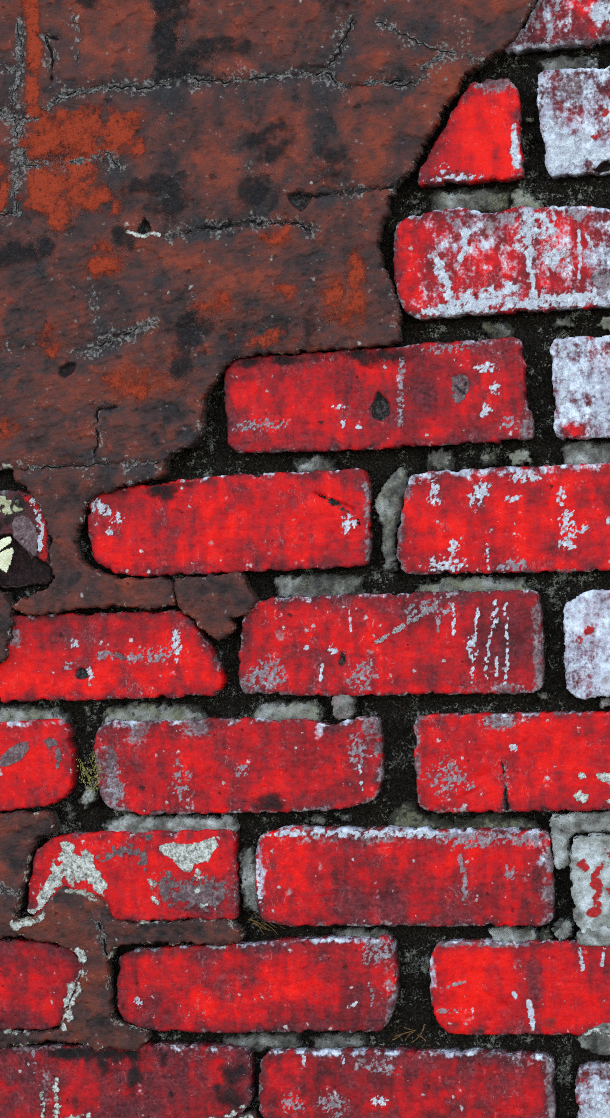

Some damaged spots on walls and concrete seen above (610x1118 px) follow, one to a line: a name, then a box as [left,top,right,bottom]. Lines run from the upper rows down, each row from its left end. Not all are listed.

water stain [592,0,610,22]
water stain [545,111,610,172]
spalling [594,160,610,173]
spalling [126,219,161,238]
peeling [0,494,51,586]
peeling [0,741,29,767]
peeling [573,772,610,803]
peeling [10,834,233,931]
peeling [576,848,610,917]
spalling [61,948,88,1031]
water stain [512,992,535,1031]
water stain [580,1075,610,1118]